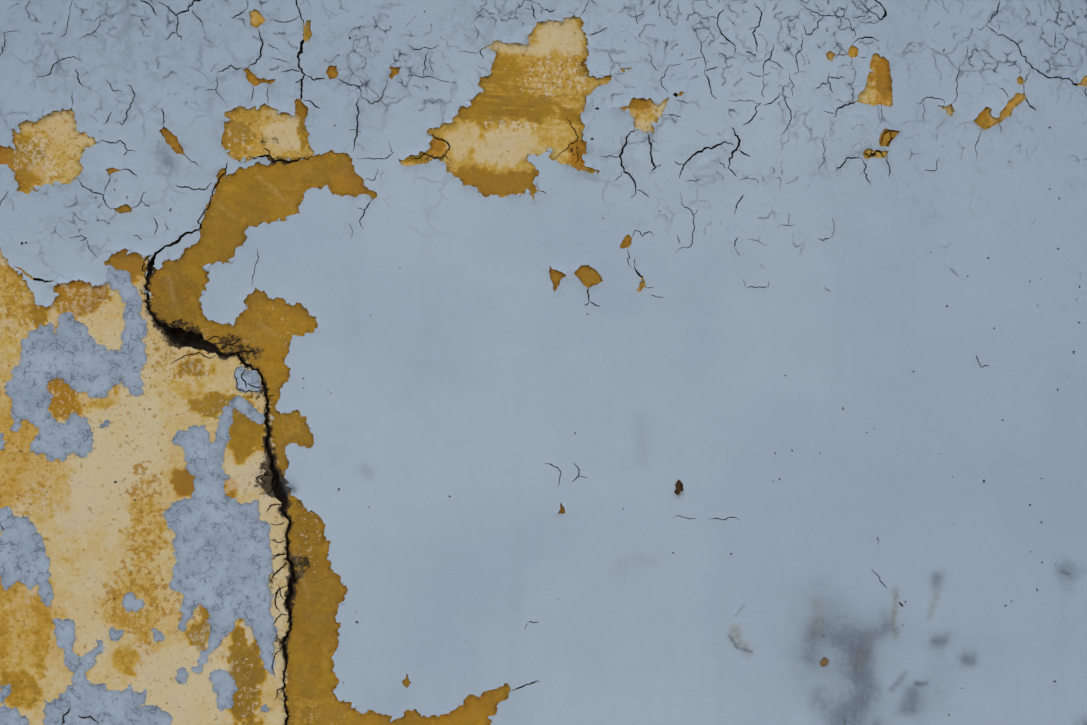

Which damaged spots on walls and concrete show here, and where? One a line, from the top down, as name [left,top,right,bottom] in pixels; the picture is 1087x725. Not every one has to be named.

crack [140,0,556,237]
peeling [398,12,631,200]
peeling [619,91,684,135]
crack [556,0,898,298]
peeling [826,45,858,60]
peeling [855,52,893,109]
peeling [974,76,1026,130]
crack [919,0,1087,171]
crack [41,0,301,725]
peeling [0,98,516,725]
peeling [549,265,603,292]